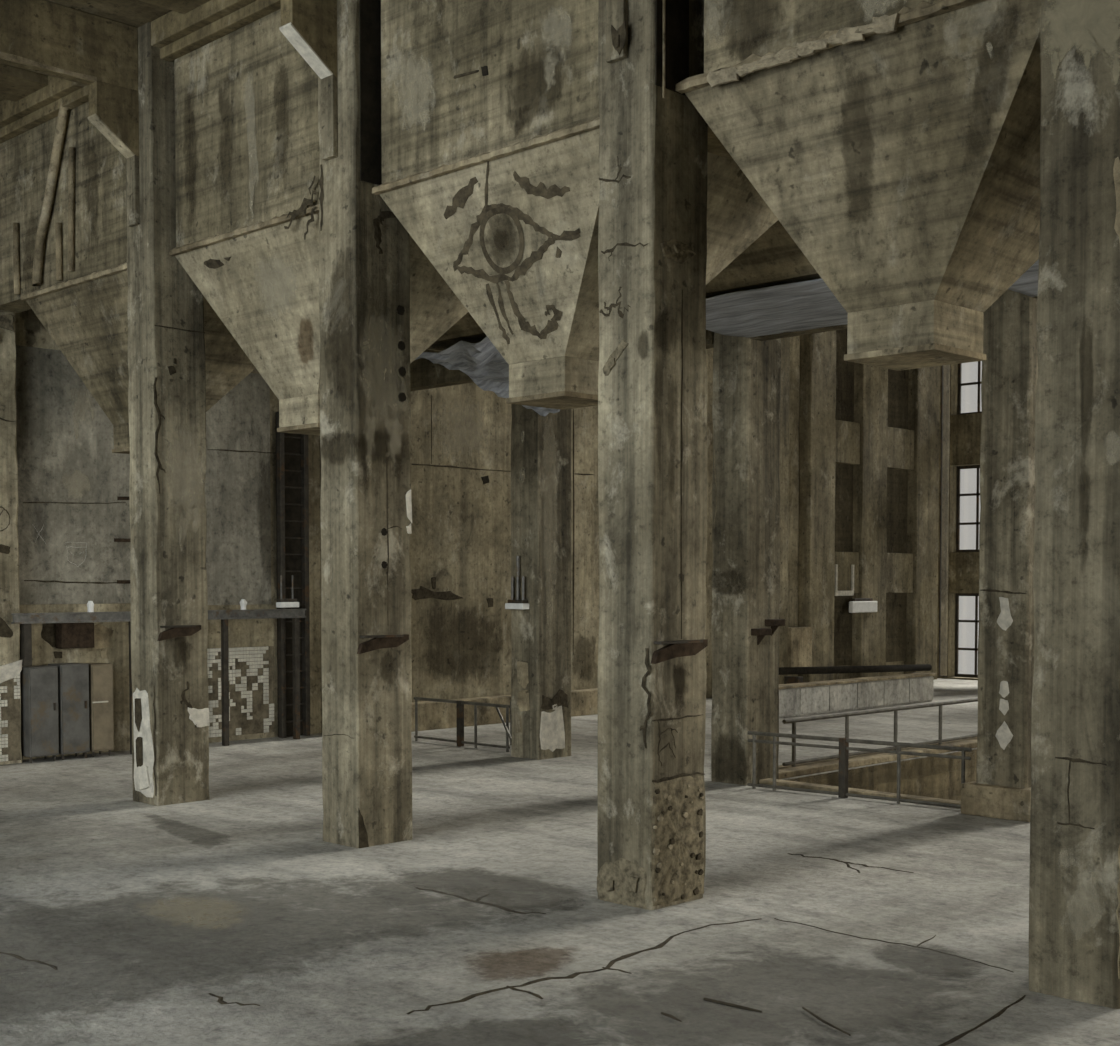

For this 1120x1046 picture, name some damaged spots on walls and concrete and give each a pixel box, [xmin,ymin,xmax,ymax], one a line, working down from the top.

crack [640,648,705,783]
spalling [597,776,704,908]
crack [406,918,1026,1046]